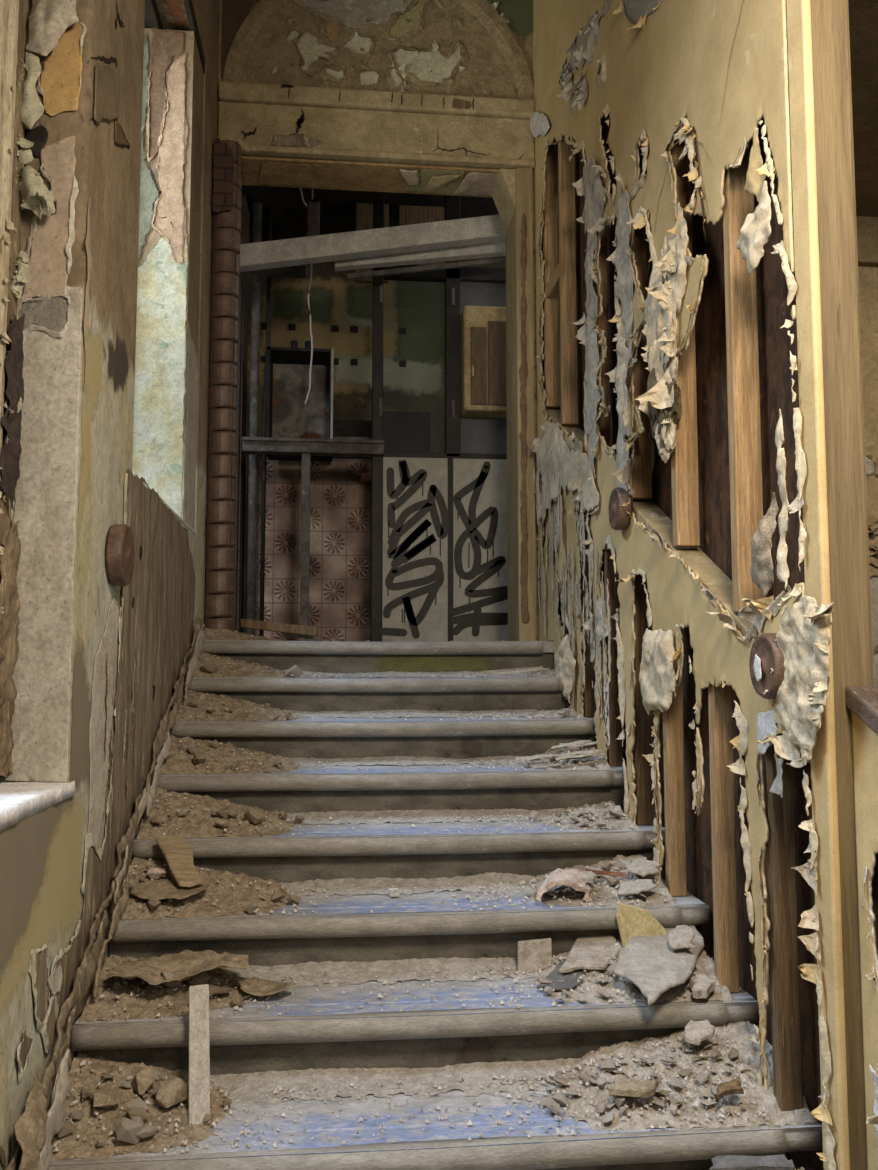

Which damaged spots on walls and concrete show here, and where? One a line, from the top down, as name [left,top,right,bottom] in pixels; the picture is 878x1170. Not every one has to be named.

peeling [273,0,474,109]
crack [391,93,474,109]
peeling [138,27,188,263]
crack [434,138,491,156]
peeling [734,137,775,177]
peeling [586,207,649,247]
peeling [570,303,644,413]
flaking render [0,22,87,777]
peeling [754,654,762,681]
peeling [727,732,759,780]
peeling [757,730,804,768]
peeling [14,469,196,1170]